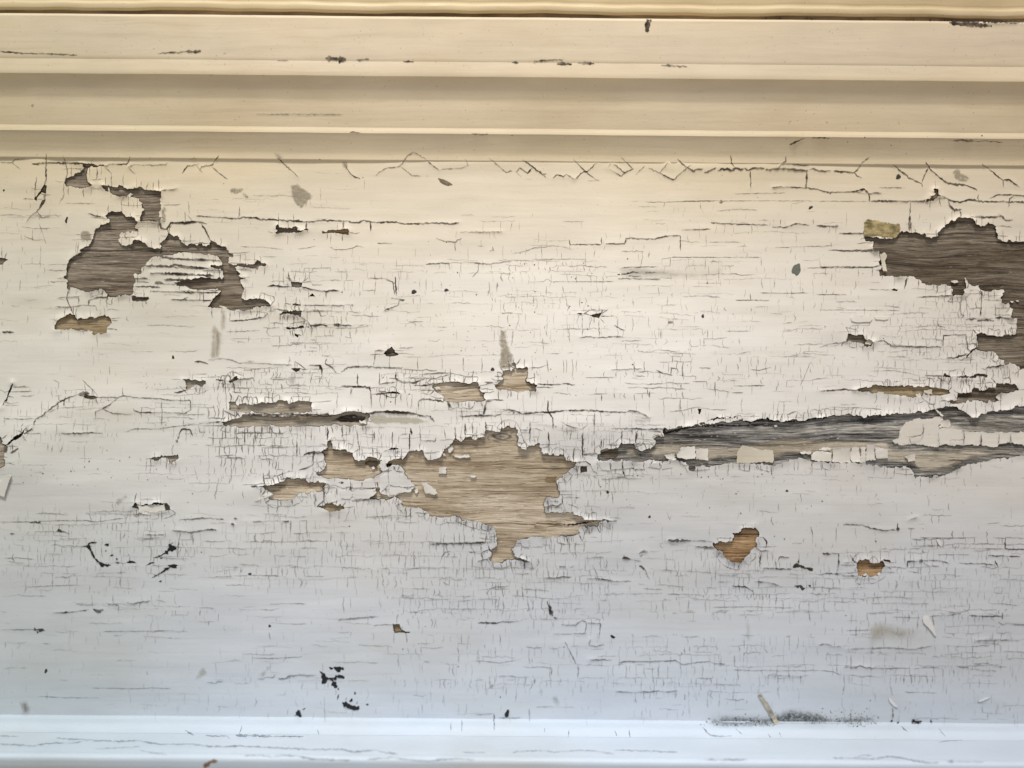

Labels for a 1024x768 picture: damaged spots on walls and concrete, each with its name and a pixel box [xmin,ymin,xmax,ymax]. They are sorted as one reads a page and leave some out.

peeling [54,313,112,335]
peeling [64,163,271,311]
peeling [221,400,370,428]
peeling [432,362,537,403]
crack [1,137,1024,731]
peeling [258,373,1024,563]
peeling [864,217,1024,370]
peeling [856,559,891,577]